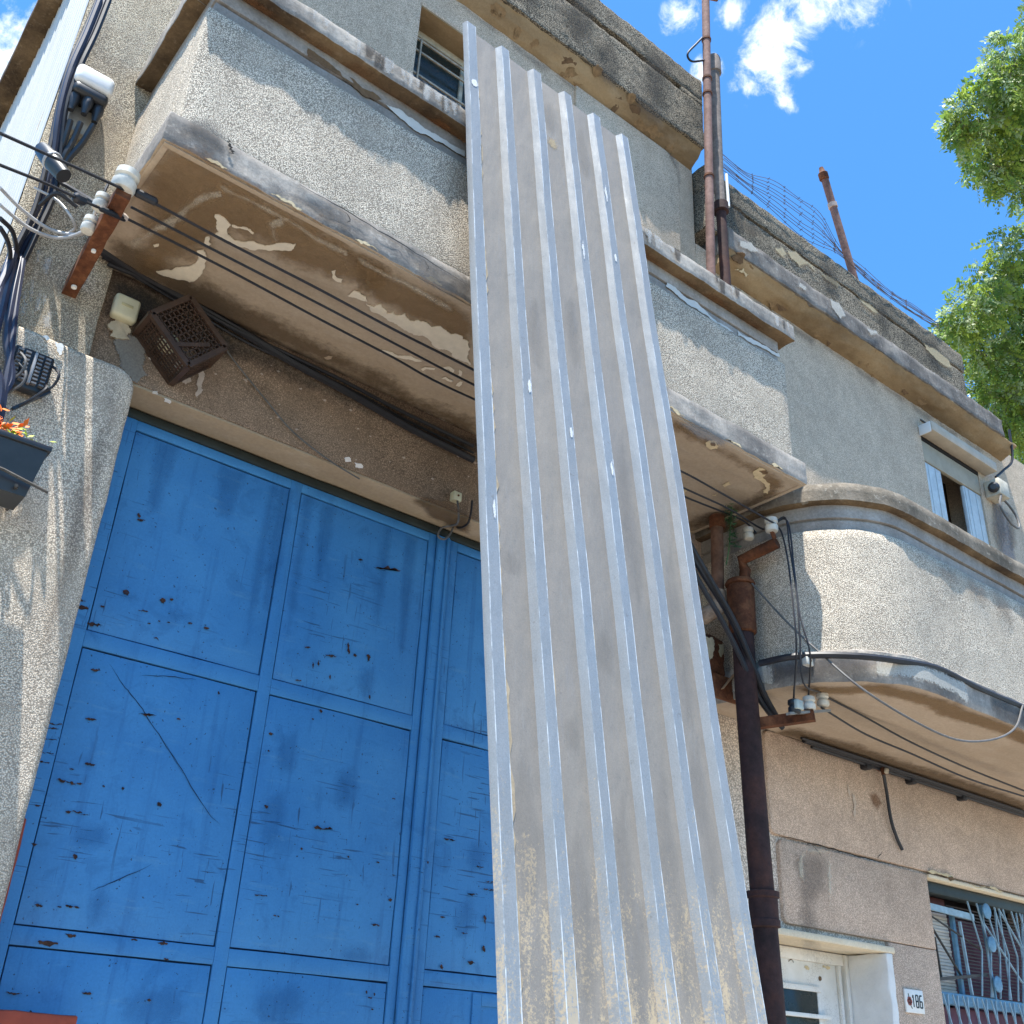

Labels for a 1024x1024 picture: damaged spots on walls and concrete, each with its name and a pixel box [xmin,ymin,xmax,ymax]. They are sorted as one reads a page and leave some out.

leakage [190,121,223,147]
peeling [156,214,296,282]
leakage [114,155,477,451]
leakage [673,424,724,444]
spalling [753,463,783,494]